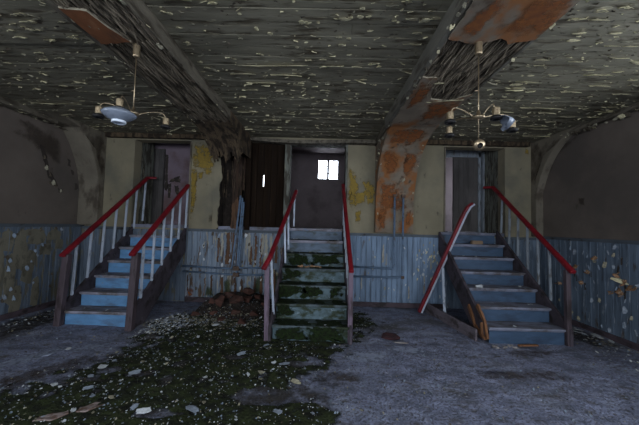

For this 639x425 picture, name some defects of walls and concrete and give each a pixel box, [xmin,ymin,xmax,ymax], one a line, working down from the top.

peeling [0,9,199,135]
peeling [183,3,391,137]
rust [464,0,504,35]
peeling [453,0,639,142]
spalling [376,129,425,183]
peeling [0,227,63,313]
spalling [187,150,278,296]
peeling [569,244,639,328]